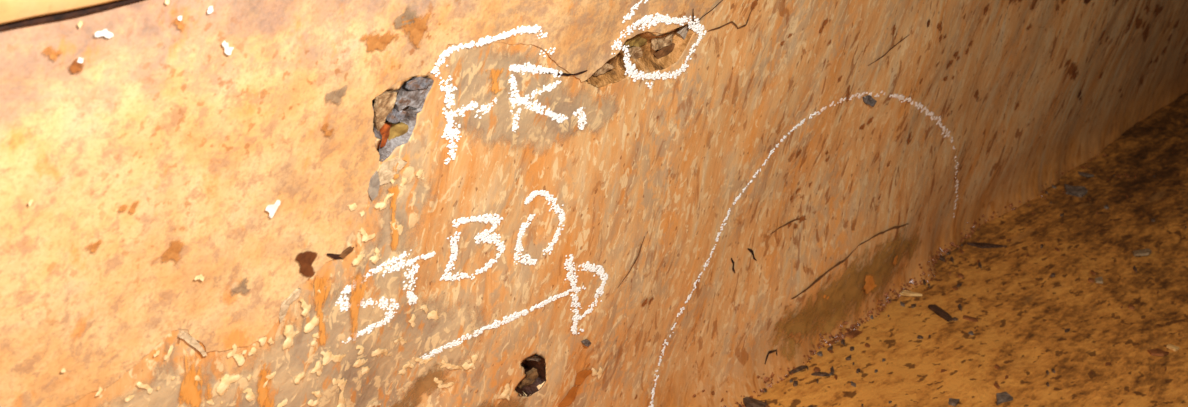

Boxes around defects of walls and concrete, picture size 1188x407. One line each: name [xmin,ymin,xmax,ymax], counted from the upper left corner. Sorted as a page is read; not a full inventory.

spalling [372,77,434,162]
peeling [446,23,697,153]
rust [0,0,716,407]
peeling [95,169,485,407]
rust [996,392,1013,405]